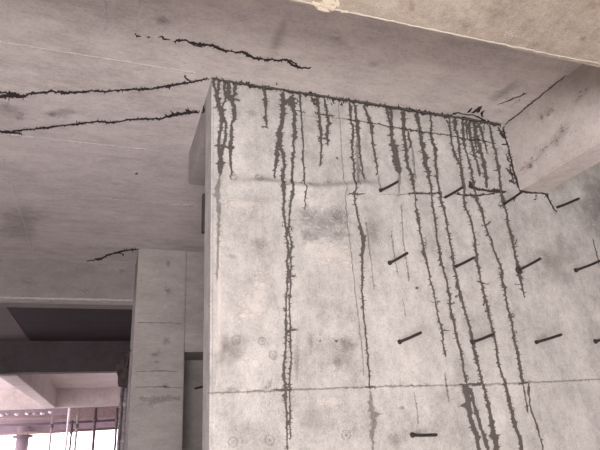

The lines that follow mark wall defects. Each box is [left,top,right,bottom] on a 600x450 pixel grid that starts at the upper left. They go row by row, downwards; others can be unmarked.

crack [135,33,311,69]
crack [0,75,566,159]
crack [400,181,557,212]
crack [86,248,138,262]